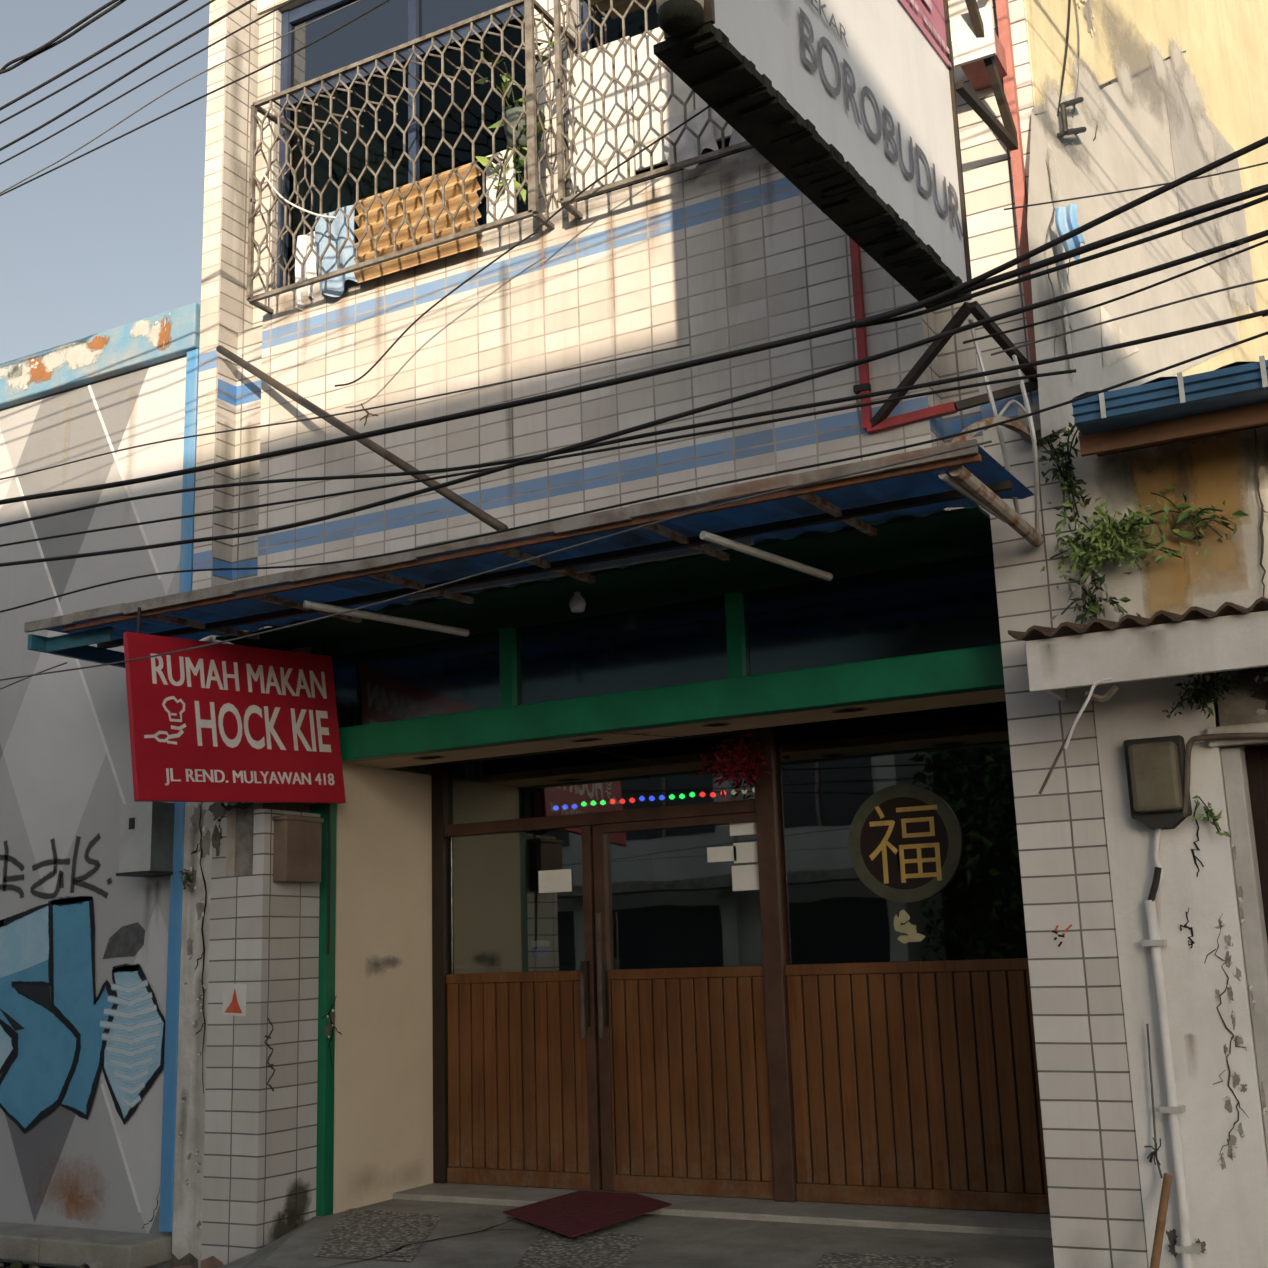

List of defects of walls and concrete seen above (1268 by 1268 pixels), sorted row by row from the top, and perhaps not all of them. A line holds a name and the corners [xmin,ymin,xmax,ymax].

peeling [0,335,109,395]
peeling [130,313,171,350]
crack [1254,427,1268,598]
crack [191,802,253,1094]